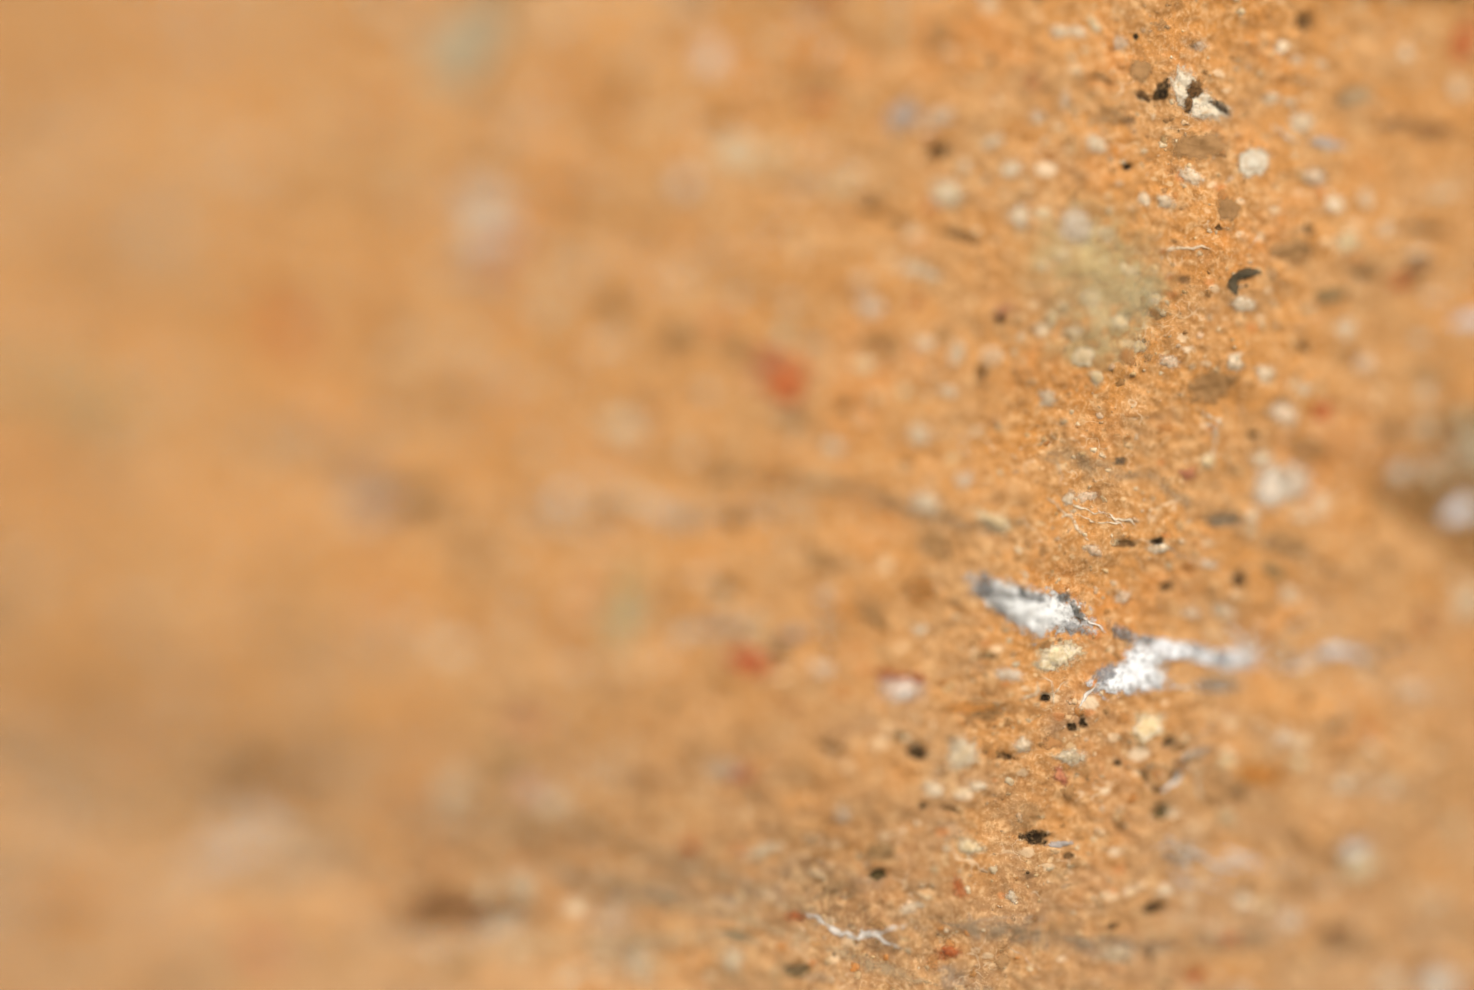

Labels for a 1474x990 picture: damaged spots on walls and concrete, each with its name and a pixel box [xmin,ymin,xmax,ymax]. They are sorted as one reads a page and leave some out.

damp [965,570,1436,707]